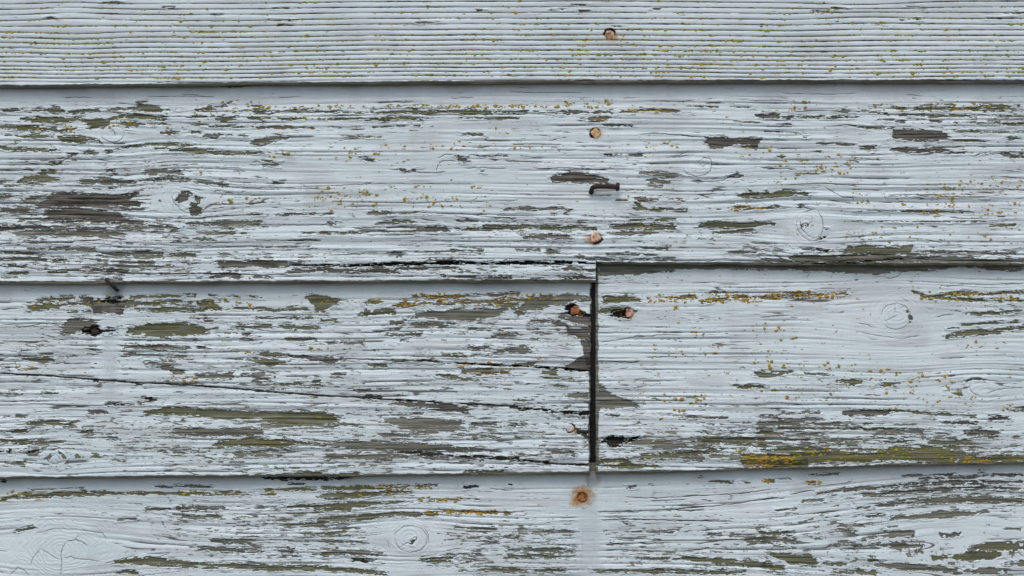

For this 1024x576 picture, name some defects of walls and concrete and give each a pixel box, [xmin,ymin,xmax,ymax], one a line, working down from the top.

peeling [704,103,1024,158]
peeling [0,101,720,283]
peeling [7,349,55,369]
crack [1,363,382,400]
peeling [26,293,364,386]
crack [460,402,522,410]
peeling [201,171,1024,417]
peeling [0,389,576,576]
rust [572,488,591,505]
peeling [592,406,1024,576]